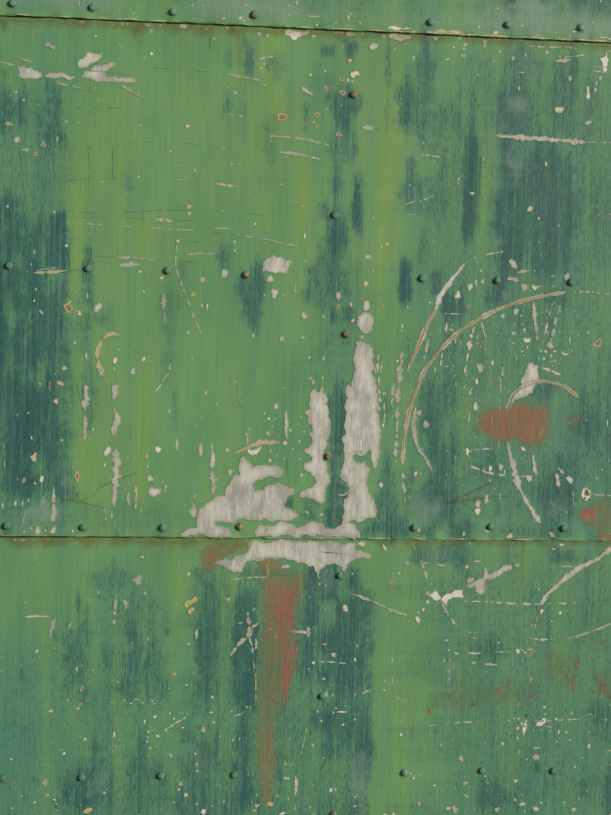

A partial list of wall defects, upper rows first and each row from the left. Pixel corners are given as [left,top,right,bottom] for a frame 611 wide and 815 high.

peeling [0,51,144,99]
peeling [180,251,611,581]
peeling [352,563,611,658]